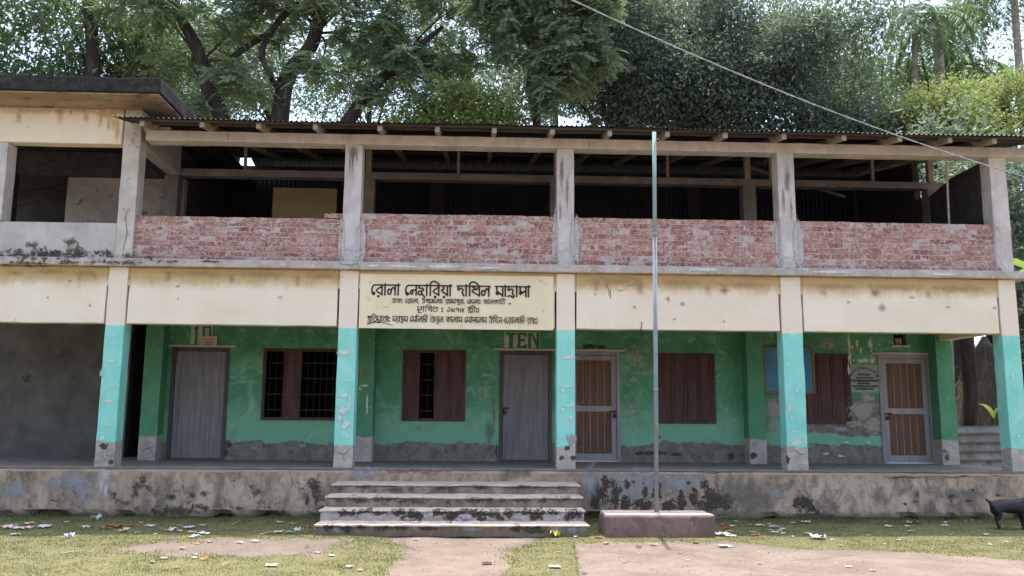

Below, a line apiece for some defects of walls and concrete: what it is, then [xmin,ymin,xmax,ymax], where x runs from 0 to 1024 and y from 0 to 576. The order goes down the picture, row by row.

mould [0,237,179,267]
peeling [337,380,369,438]
peeling [823,392,884,458]
damp [99,468,208,517]